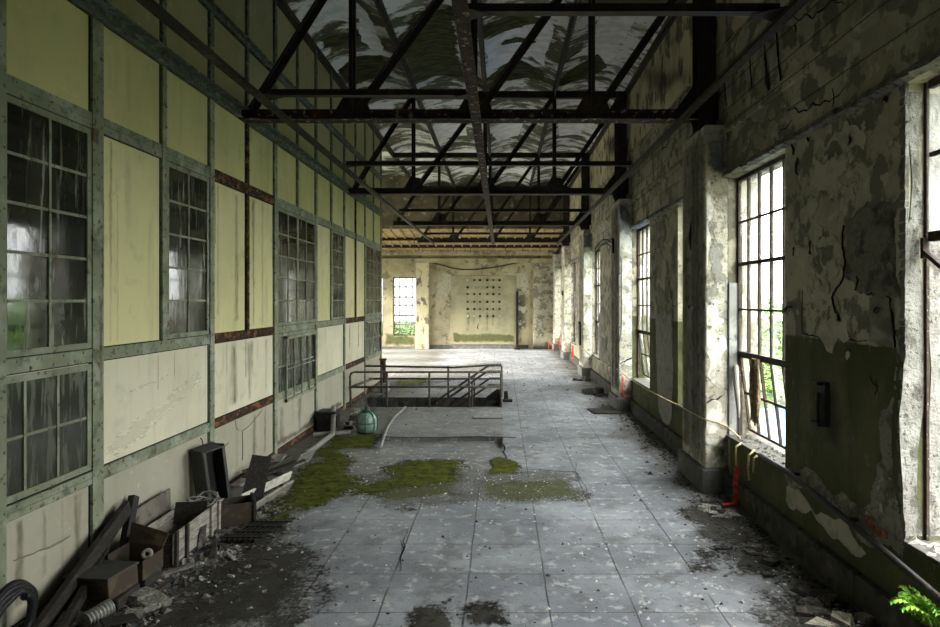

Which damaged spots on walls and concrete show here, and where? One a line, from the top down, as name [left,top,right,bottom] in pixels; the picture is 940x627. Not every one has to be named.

crack [780,87,845,130]
flaking render [785,83,940,560]
crack [831,225,896,348]